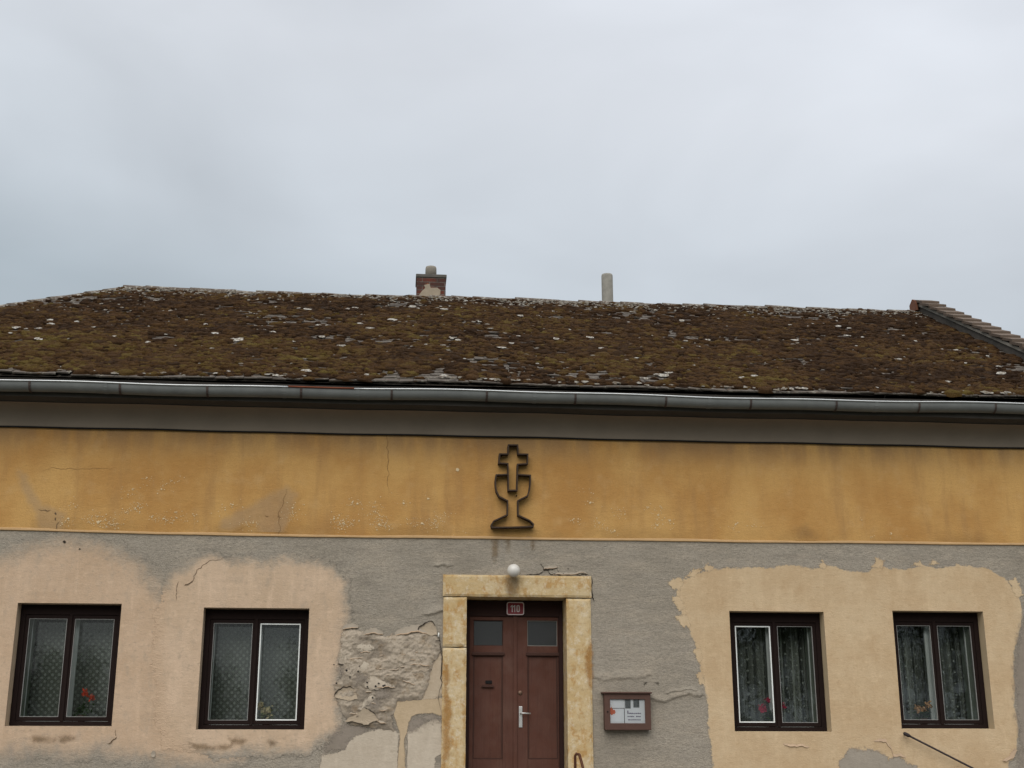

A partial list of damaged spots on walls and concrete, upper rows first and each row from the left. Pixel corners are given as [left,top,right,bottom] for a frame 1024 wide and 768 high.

flaking render [333,621,441,732]
flaking render [839,738,917,768]